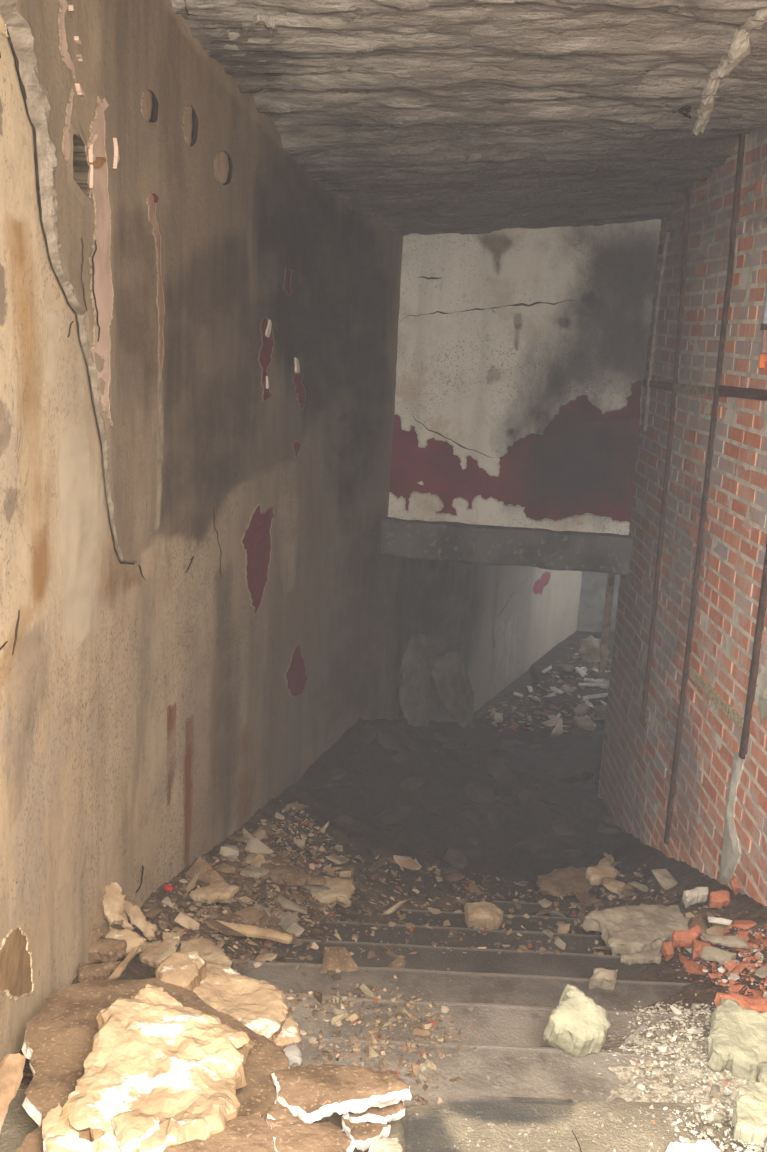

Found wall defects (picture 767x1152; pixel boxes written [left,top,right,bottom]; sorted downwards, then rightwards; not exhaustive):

spalling [691,8,767,135]
peeling [58,0,120,427]
crack [0,0,145,579]
peeling [257,317,275,401]
crack [401,300,578,321]
peeling [389,380,643,524]
peeling [241,503,275,616]
crack [0,610,20,655]
spalling [0,925,34,1000]